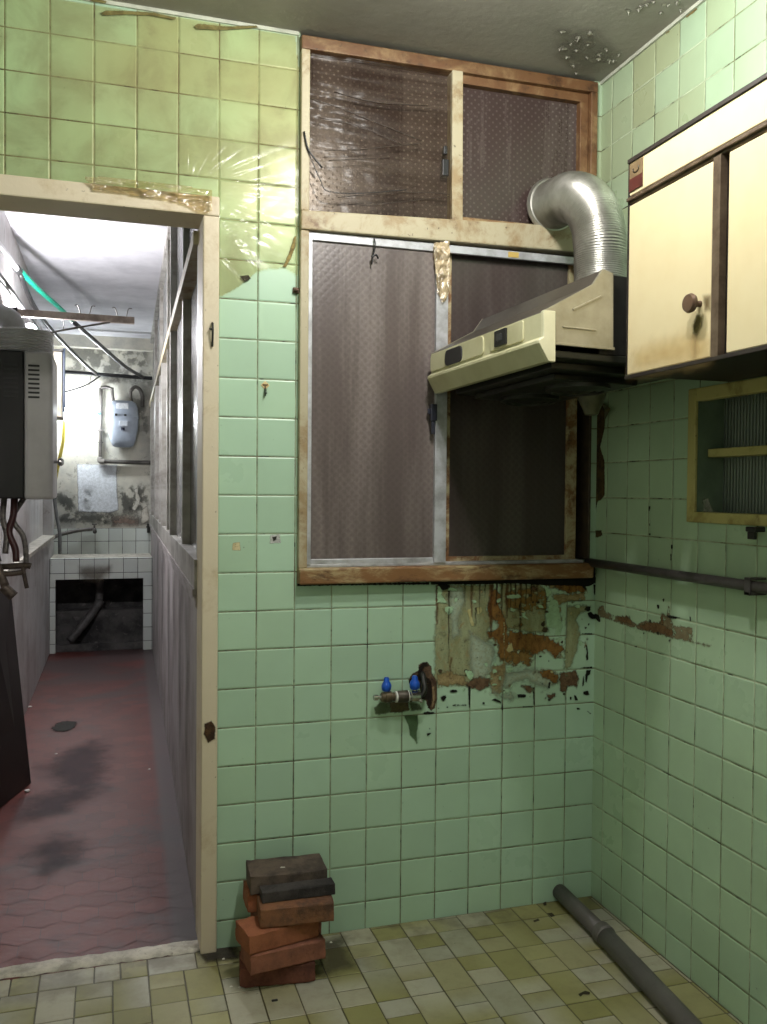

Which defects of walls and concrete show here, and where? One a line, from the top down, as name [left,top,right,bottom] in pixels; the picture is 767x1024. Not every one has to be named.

peeling [558,30,622,75]
leakage [70,348,146,426]
leakage [57,487,146,523]
rust [487,585,587,684]
peeling [409,584,710,711]